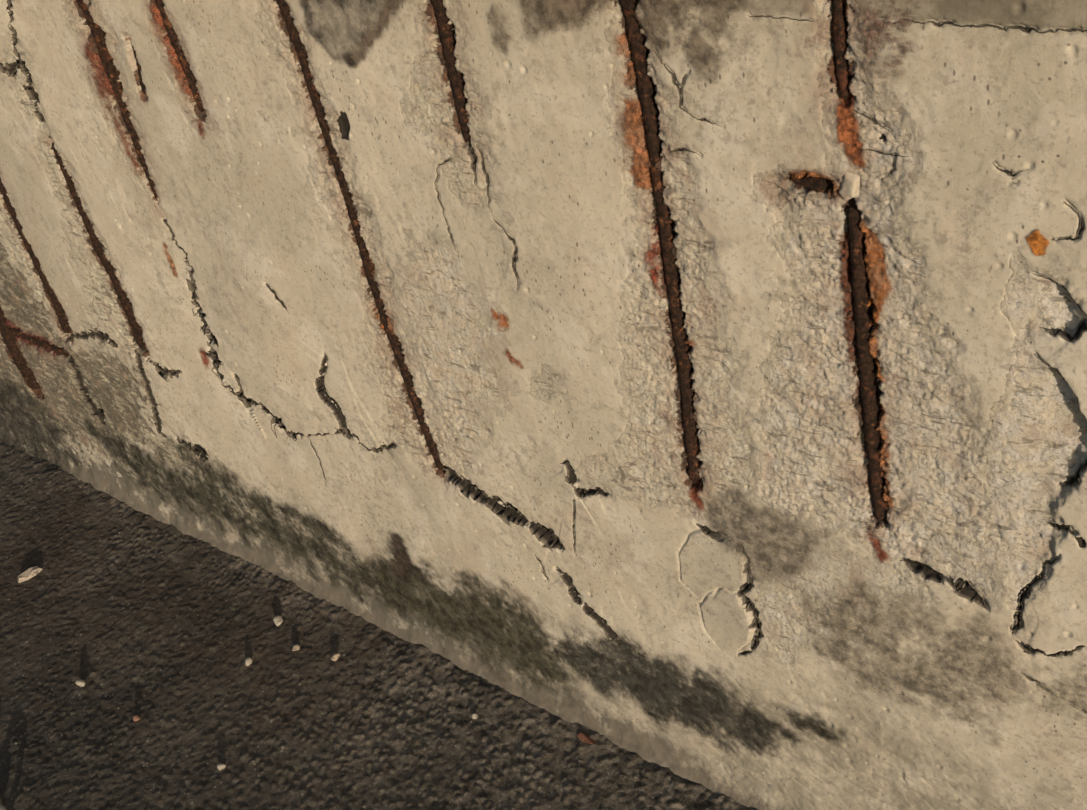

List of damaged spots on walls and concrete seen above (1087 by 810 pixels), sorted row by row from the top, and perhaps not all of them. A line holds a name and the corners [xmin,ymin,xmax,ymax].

leakage [301,0,402,66]
rust [84,43,139,171]
crack [435,136,519,291]
rust [622,100,653,190]
rust [836,89,865,168]
leakage [0,381,79,466]
crack [163,220,395,484]
spalling [574,0,1087,669]
rust [839,225,893,507]
crack [1035,274,1087,421]
leakage [85,420,842,756]
crack [696,524,763,656]